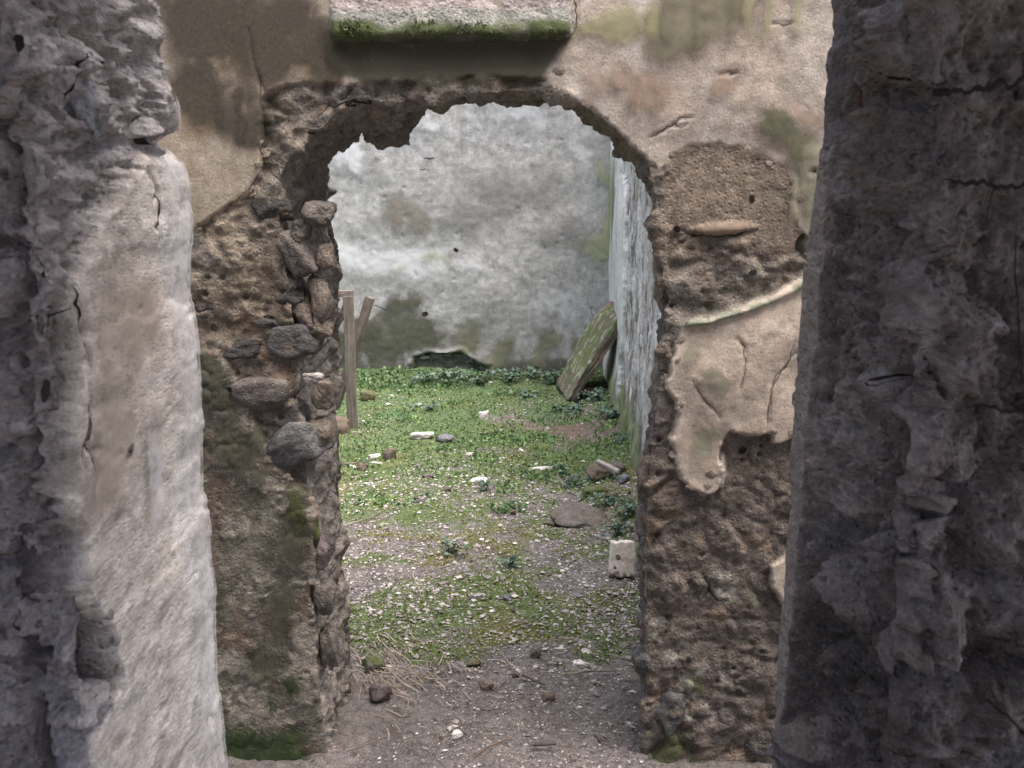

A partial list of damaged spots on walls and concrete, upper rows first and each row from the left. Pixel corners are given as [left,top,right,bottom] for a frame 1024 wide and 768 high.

crack [878,72,1024,98]
damp [334,142,363,175]
crack [148,175,160,243]
crack [942,178,1024,225]
crack [36,254,91,368]
damp [336,232,579,373]
flaking render [188,66,609,756]
crack [767,348,797,425]
spalling [618,143,869,763]